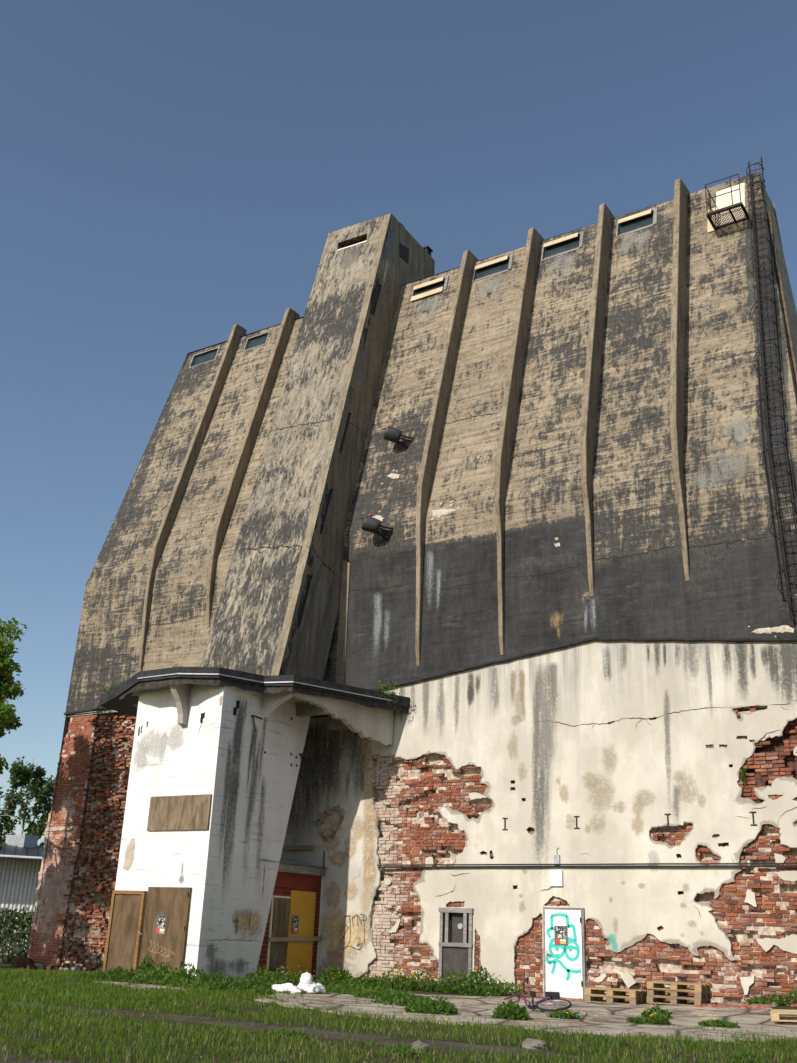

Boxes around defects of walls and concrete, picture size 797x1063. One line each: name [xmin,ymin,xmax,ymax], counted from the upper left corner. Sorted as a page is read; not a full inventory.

damp [374,595,389,644]
damp [222,704,265,869]
damp [456,673,479,718]
damp [511,665,567,834]
crack [532,707,731,729]
flaking render [731,705,768,721]
flaking render [706,717,797,805]
damp [725,643,797,699]
crack [754,700,797,745]
flaking render [315,739,494,984]
flaking render [513,896,570,996]
flaking render [585,821,797,1005]